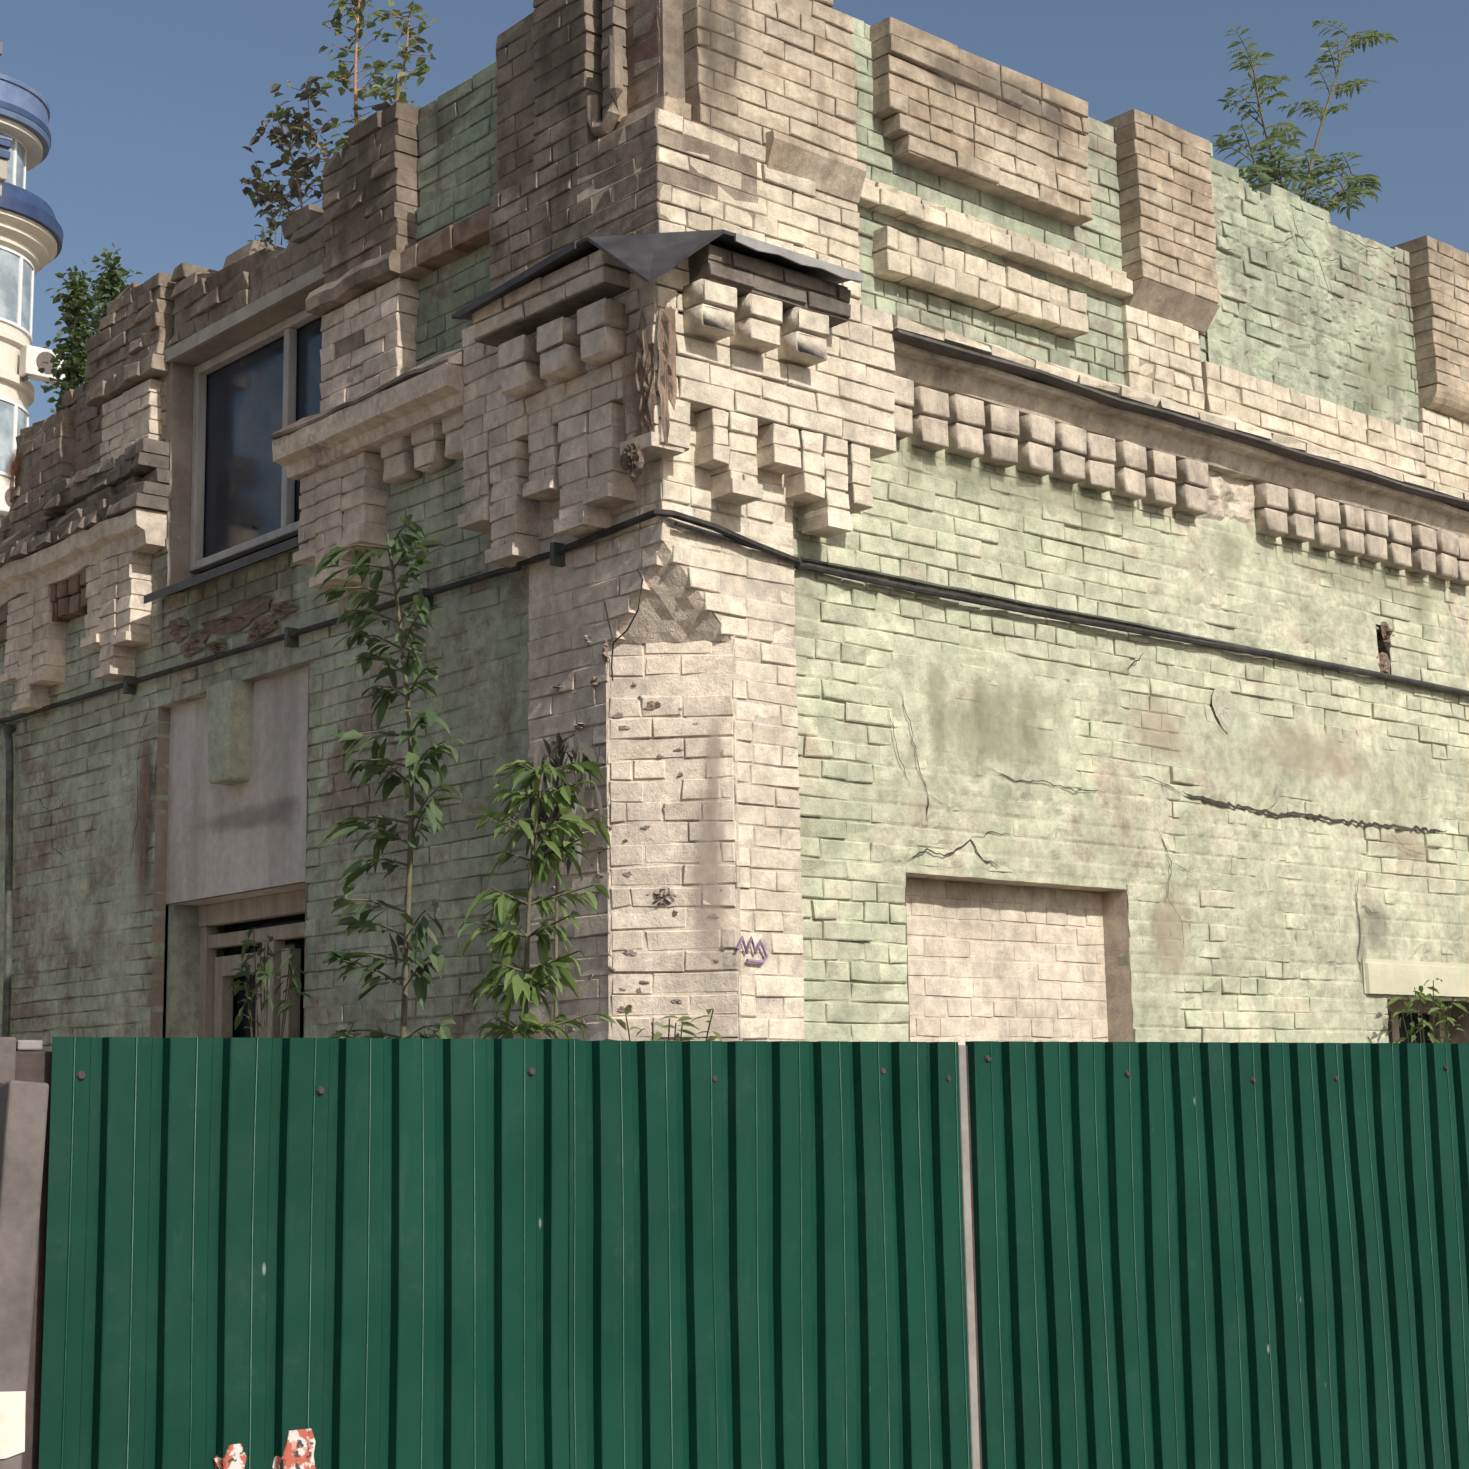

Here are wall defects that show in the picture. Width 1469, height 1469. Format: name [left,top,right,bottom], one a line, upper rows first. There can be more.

crack [1143,776,1447,854]
crack [1158,830,1191,961]
crack [1356,871,1381,973]